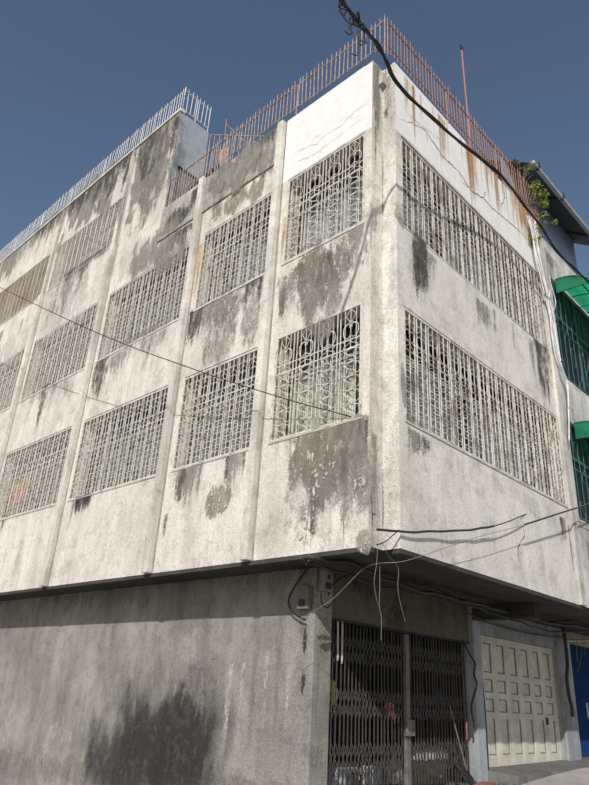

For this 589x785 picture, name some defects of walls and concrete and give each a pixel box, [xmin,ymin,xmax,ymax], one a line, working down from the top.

leakage [0,112,183,280]
crack [294,102,369,159]
leakage [373,62,390,134]
crack [403,106,518,230]
rust [461,144,479,191]
rust [486,166,534,243]
leakage [187,277,263,346]
leakage [277,249,342,326]
leakage [413,234,434,294]
peeling [295,444,344,544]
leakage [287,415,384,539]
leakage [0,653,256,785]